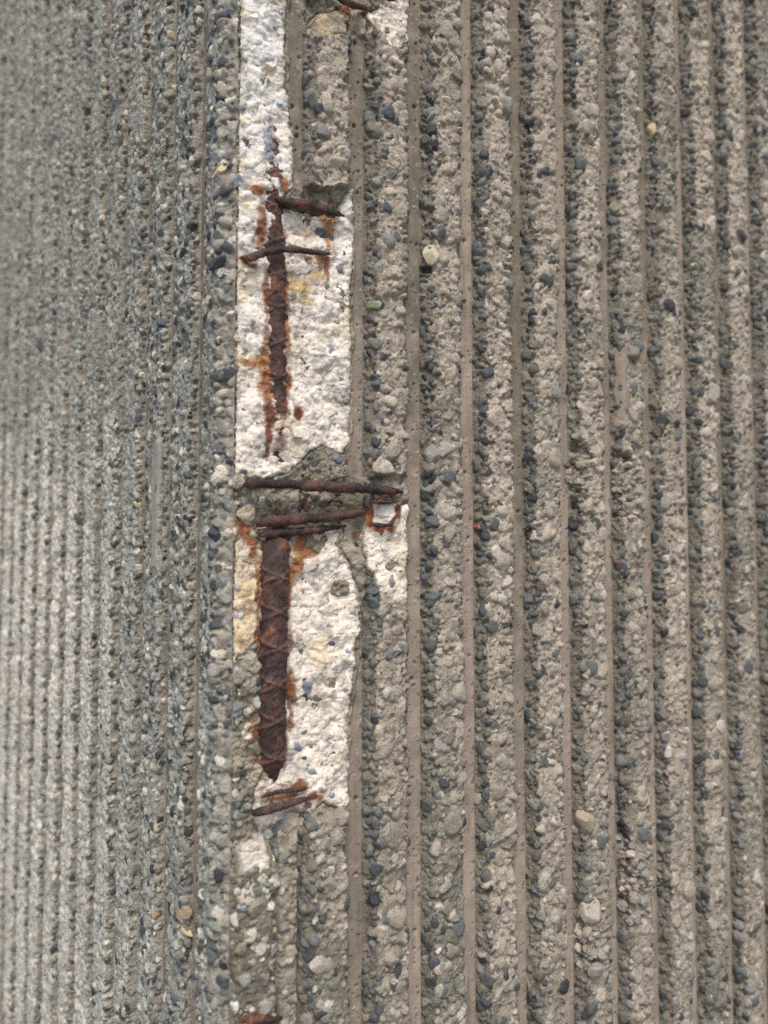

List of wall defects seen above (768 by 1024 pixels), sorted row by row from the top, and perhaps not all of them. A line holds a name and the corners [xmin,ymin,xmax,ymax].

spalling [305,0,411,49]
corrosion [238,256,270,312]
corrosion [251,184,267,248]
spalling [209,0,358,479]
corrosion [305,216,336,280]
corrosion [240,327,303,456]
corrosion [354,497,401,539]
corrosion [236,519,260,654]
corrosion [287,535,316,617]
corrosion [285,670,295,746]
spalling [231,476,411,912]
corrosion [246,718,323,801]